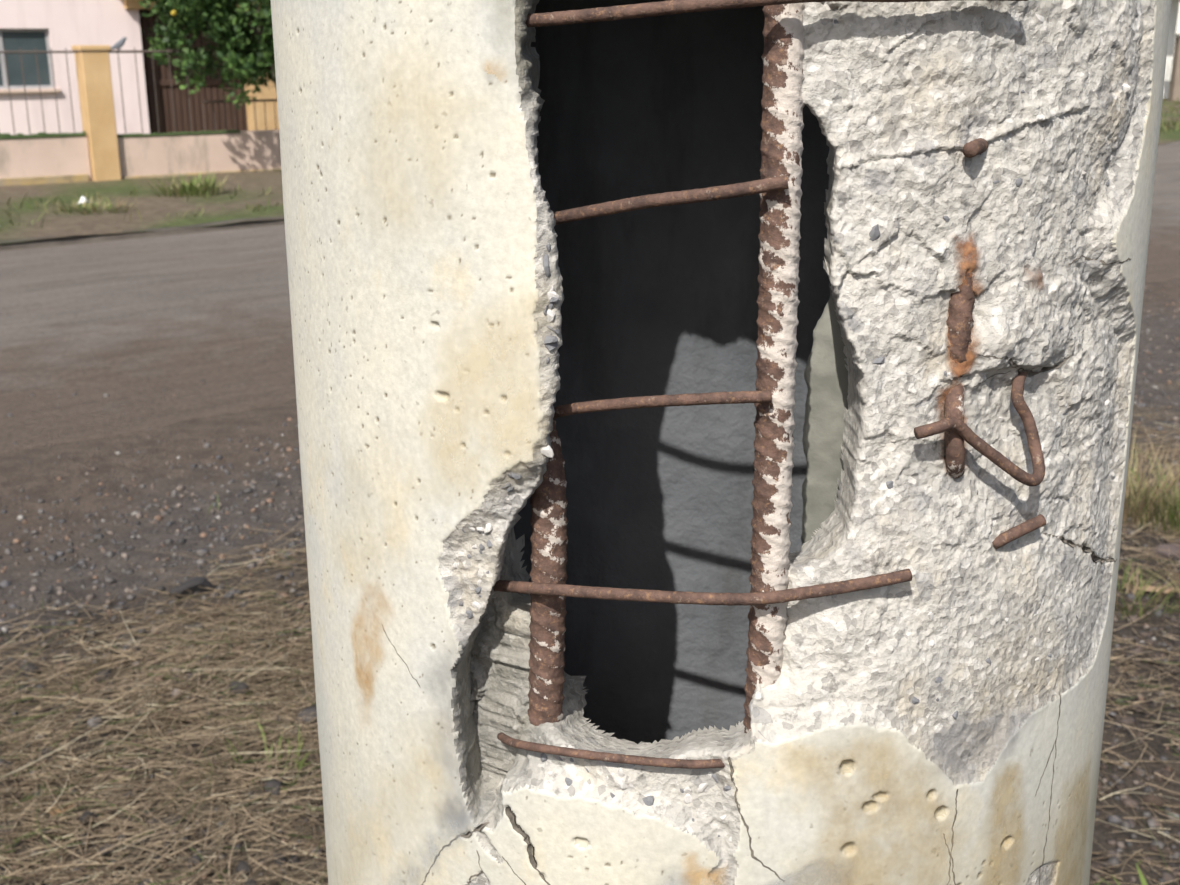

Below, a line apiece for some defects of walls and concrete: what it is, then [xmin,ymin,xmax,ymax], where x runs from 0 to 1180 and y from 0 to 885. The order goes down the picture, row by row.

corrosion [957,236,981,296]
corrosion [938,329,976,420]
spalling [438,0,1156,885]
crack [421,807,550,885]
crack [727,757,785,882]
crack [943,789,958,885]
crack [1035,693,1061,885]